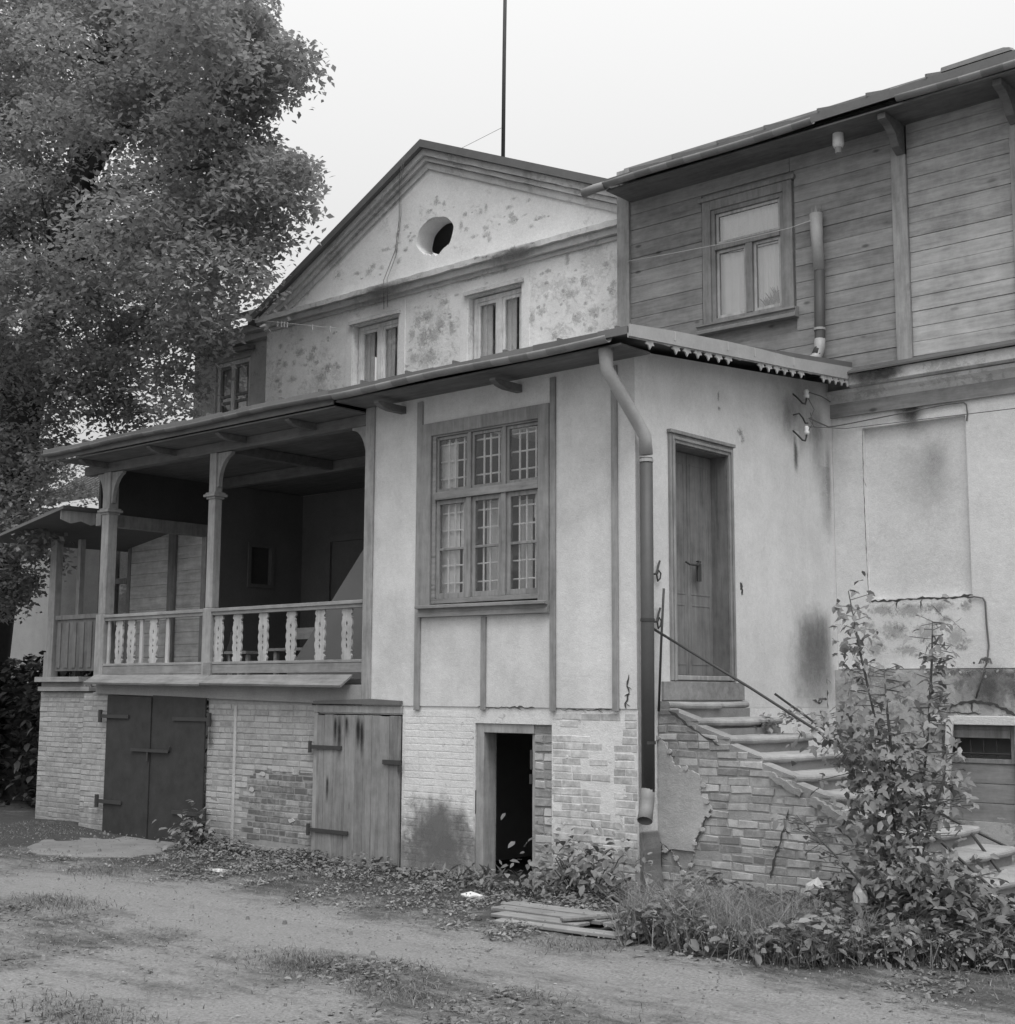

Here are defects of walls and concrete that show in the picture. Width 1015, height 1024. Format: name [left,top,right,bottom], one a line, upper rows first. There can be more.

crack [560,675,631,712]
leakage [334,718,363,749]
flaking render [237,768,313,846]
leakage [413,806,461,873]
crack [770,809,789,878]
flaking render [656,709,950,916]